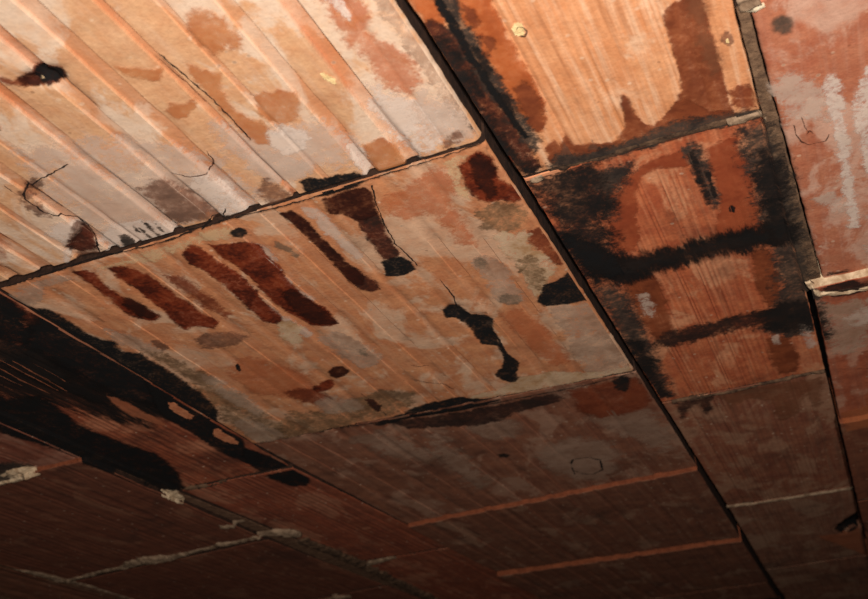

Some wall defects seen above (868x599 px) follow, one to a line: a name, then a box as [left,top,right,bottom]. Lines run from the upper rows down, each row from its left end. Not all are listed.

damp [332,0,351,21]
damp [367,0,477,153]
corrosion [73,266,231,330]
damp [10,122,372,268]
crack [0,143,482,288]
corrosion [182,228,339,326]
damp [0,202,631,491]
corrosion [280,187,415,292]
damp [385,156,474,245]
damp [413,0,868,398]